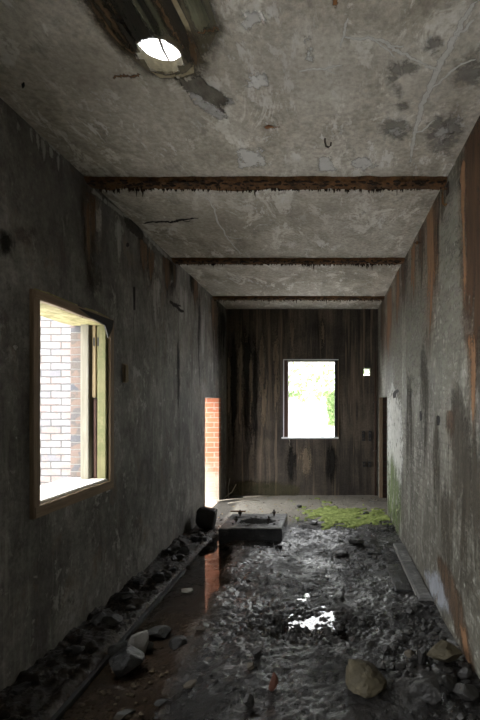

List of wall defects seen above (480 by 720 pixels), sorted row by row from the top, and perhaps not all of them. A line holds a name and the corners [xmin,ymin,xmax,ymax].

spalling [174,76,234,119]
water stain [388,60,417,94]
crack [340,1,477,162]
water stain [426,116,462,154]
crack [143,217,198,225]
rust [459,116,480,426]
water stain [218,307,280,453]
water stain [285,446,312,481]
water stain [325,446,337,482]
water stain [420,351,480,574]